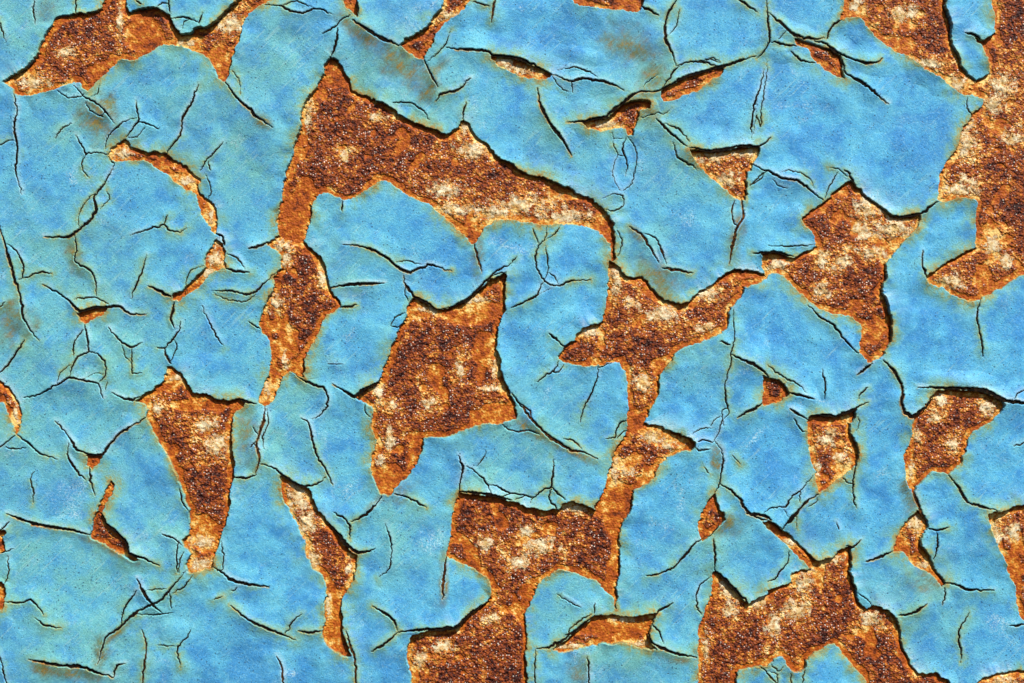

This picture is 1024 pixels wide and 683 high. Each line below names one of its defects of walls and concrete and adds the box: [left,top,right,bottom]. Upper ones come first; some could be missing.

corrosion [79,95,115,137]
peeling [4,0,269,96]
corrosion [384,48,441,99]
corrosion [605,35,646,57]
crack [393,0,887,274]
peeling [840,0,1024,301]
crack [0,85,281,683]
peeling [138,367,245,573]
crack [330,227,588,328]
peeling [259,57,949,683]
crack [692,299,1024,582]
peeling [903,389,1003,493]